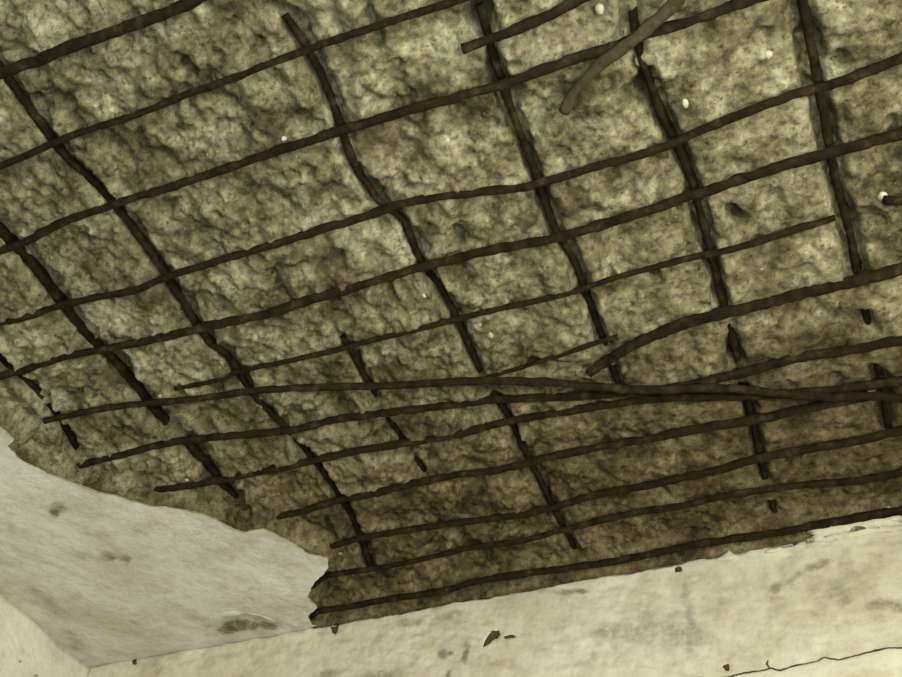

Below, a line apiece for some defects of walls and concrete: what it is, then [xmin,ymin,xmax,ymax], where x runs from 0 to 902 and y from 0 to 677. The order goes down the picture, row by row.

spalling [0,0,902,371]
spalling [0,127,902,635]
crack [728,647,902,677]